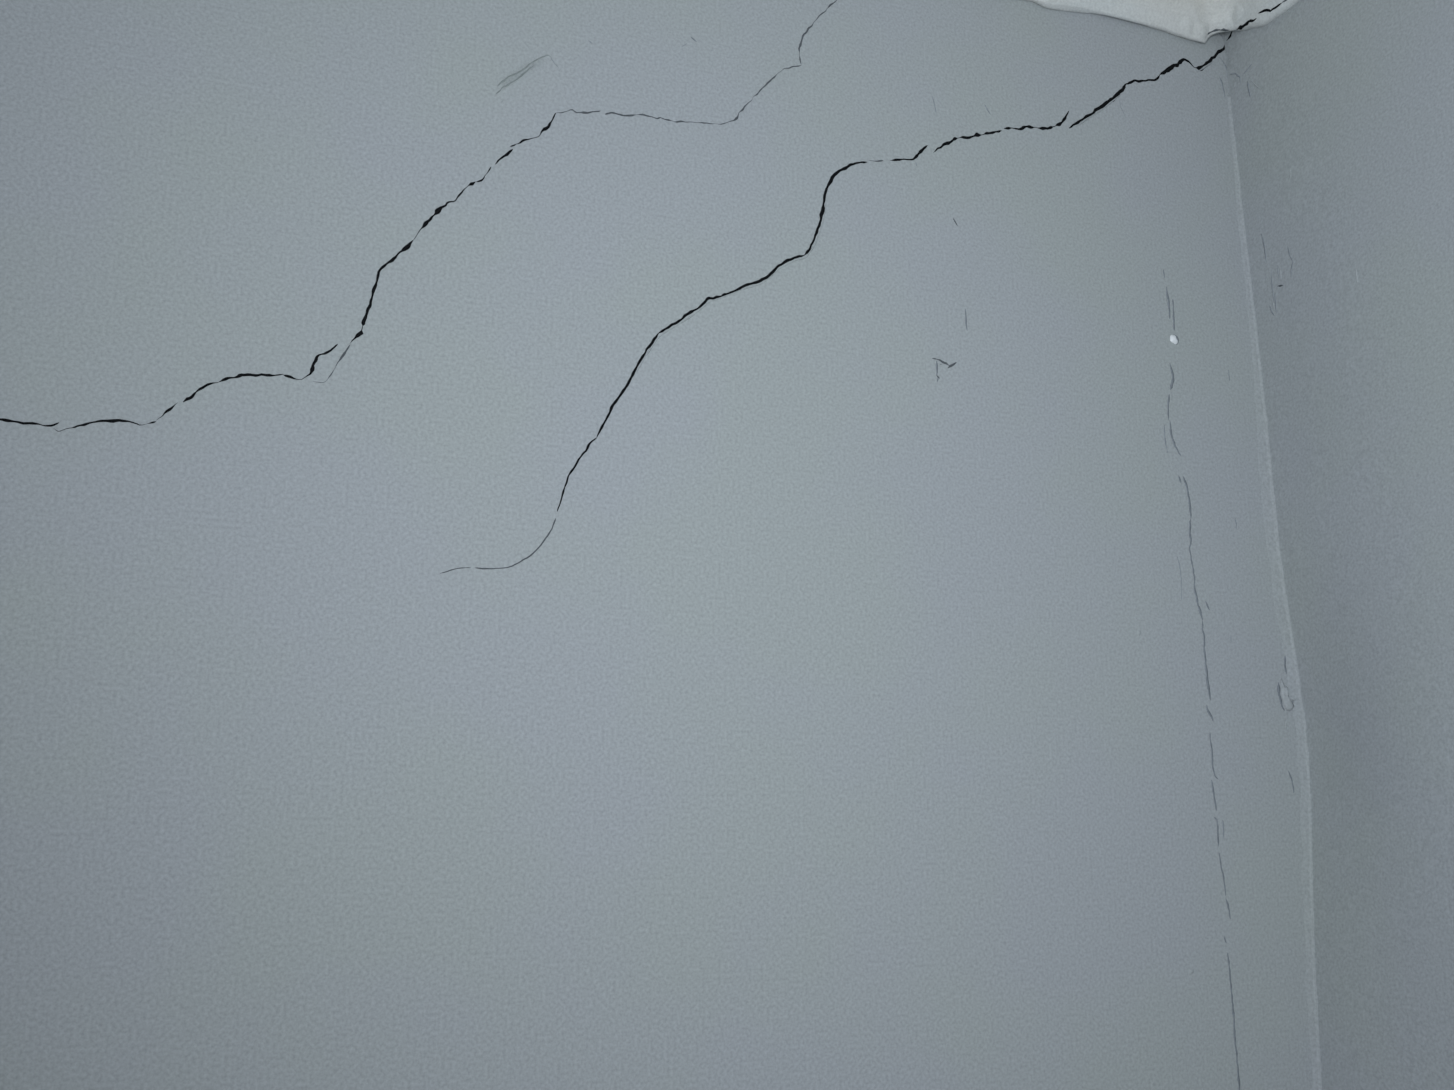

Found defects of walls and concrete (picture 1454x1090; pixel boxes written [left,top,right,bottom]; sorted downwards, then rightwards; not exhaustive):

crack [0,0,837,432]
crack [442,0,1287,573]
crack [1164,365,1240,1090]